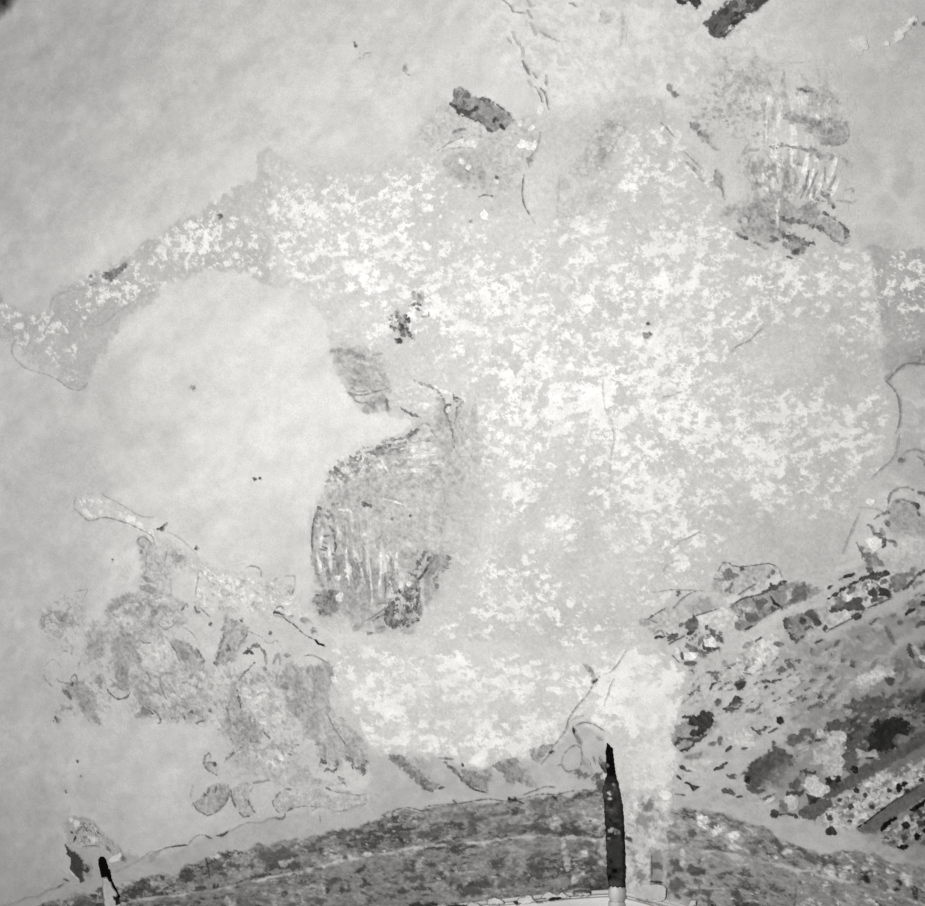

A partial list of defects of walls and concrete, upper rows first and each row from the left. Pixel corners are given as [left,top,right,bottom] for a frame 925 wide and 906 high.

spalling [675,0,702,10]
spalling [702,0,770,40]
leakage [665,83,681,99]
leakage [687,112,720,152]
leakage [710,168,726,201]
leakage [388,289,430,344]
leakage [642,321,653,339]
crack [871,361,925,478]
flaking render [0,90,925,814]
crack [840,506,884,555]
leakage [582,663,599,687]
leakage [625,797,669,886]